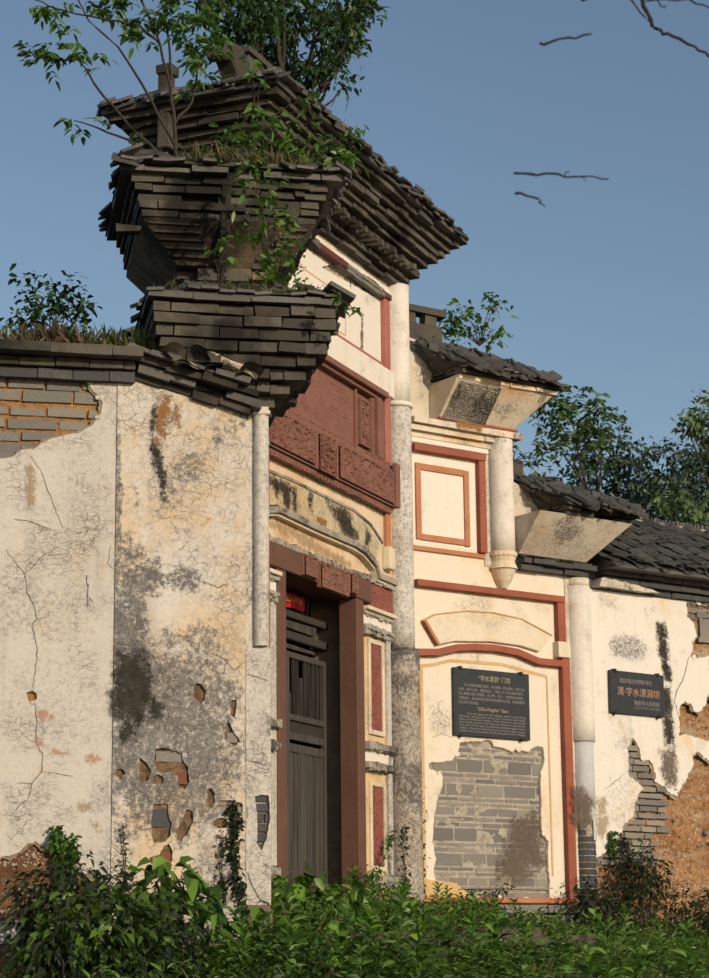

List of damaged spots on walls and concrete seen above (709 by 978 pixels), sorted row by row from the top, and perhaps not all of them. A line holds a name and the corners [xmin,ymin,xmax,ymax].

spalling [0,379,102,458]
water stain [148,405,168,503]
water stain [270,474,313,512]
water stain [326,500,371,545]
crack [6,458,68,817]
water stain [109,643,178,744]
water stain [656,621,679,790]
spalling [679,699,709,739]
spalling [150,804,193,866]
spalling [207,788,269,850]
spalling [429,741,553,898]
spalling [577,742,709,934]